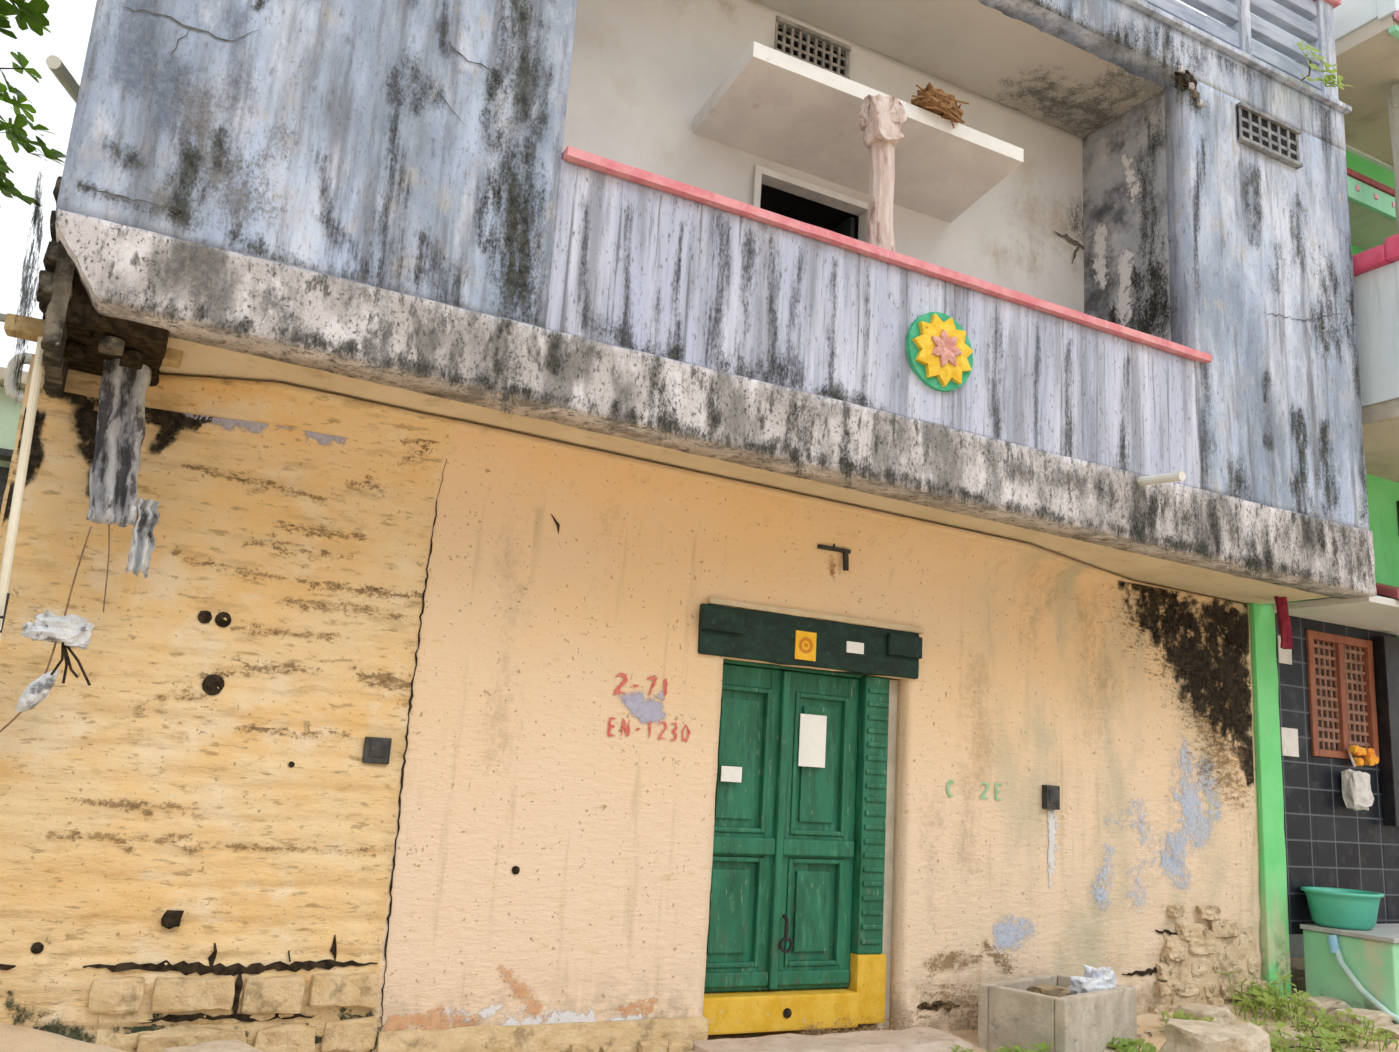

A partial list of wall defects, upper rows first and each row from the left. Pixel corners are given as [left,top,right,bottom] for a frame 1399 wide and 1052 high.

crack [120,6,258,60]
damp [706,218,906,486]
damp [3,408,45,522]
damp [44,390,99,497]
peeling [184,413,346,445]
damp [1119,363,1372,580]
crack [83,460,447,1031]
peeling [620,691,665,725]
damp [1115,581,1254,809]
peeling [1117,743,1221,907]
crack [0,963,16,971]
spalling [384,965,657,1031]